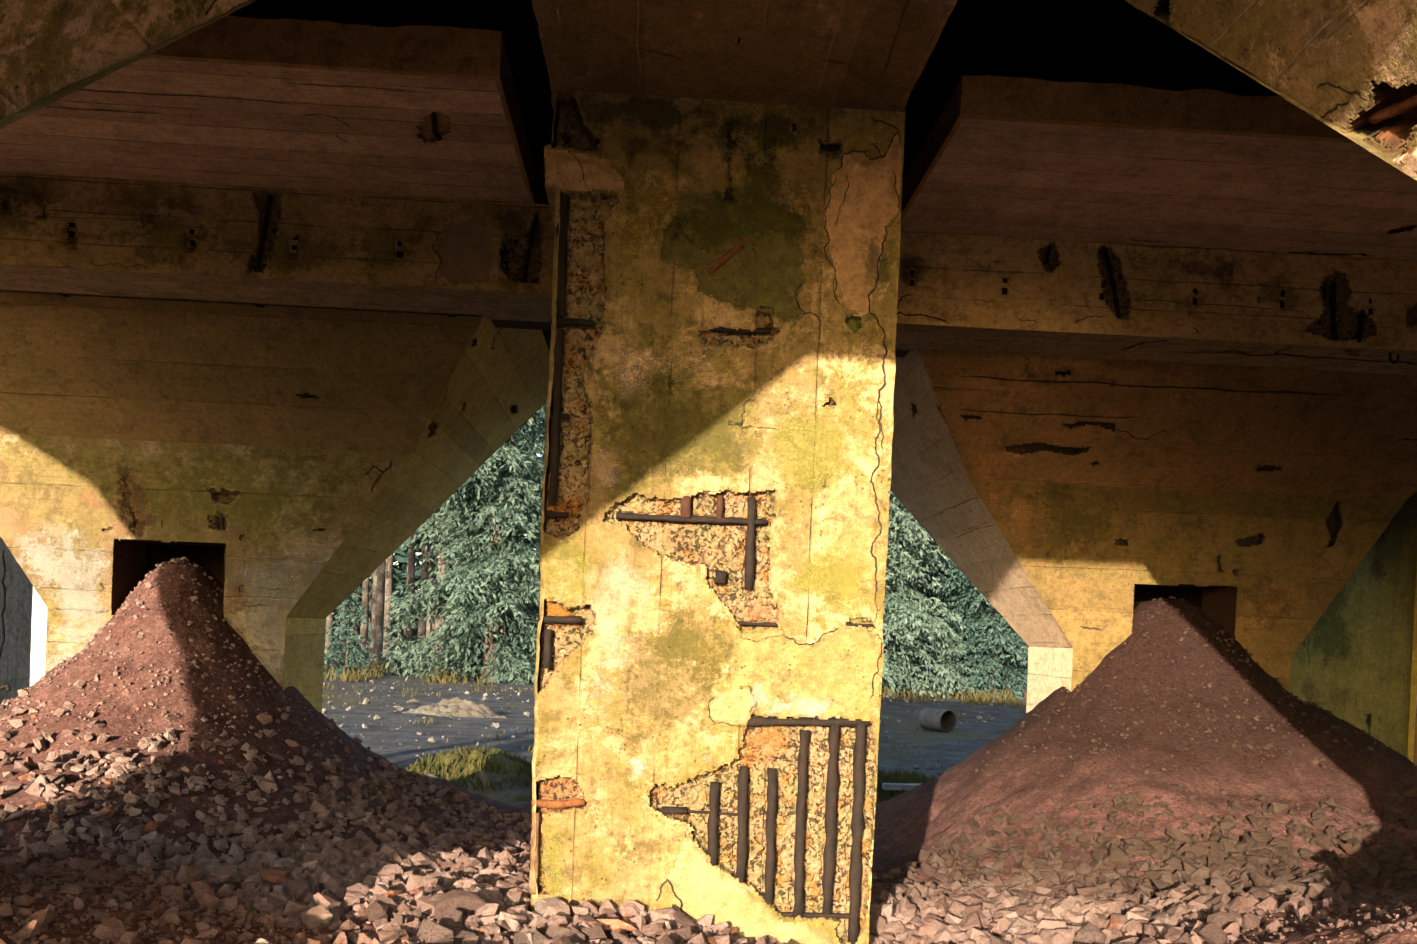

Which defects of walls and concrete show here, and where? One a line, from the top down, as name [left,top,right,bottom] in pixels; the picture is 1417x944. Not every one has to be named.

crack [1317,82,1367,118]
spalling [1347,75,1417,179]
peeling [657,190,808,350]
spalling [1097,245,1132,322]
spalling [1302,269,1377,343]
spalling [498,190,622,539]
crack [795,117,1038,699]
spalling [537,599,600,694]
spalling [601,384,880,944]
crack [784,628,838,645]